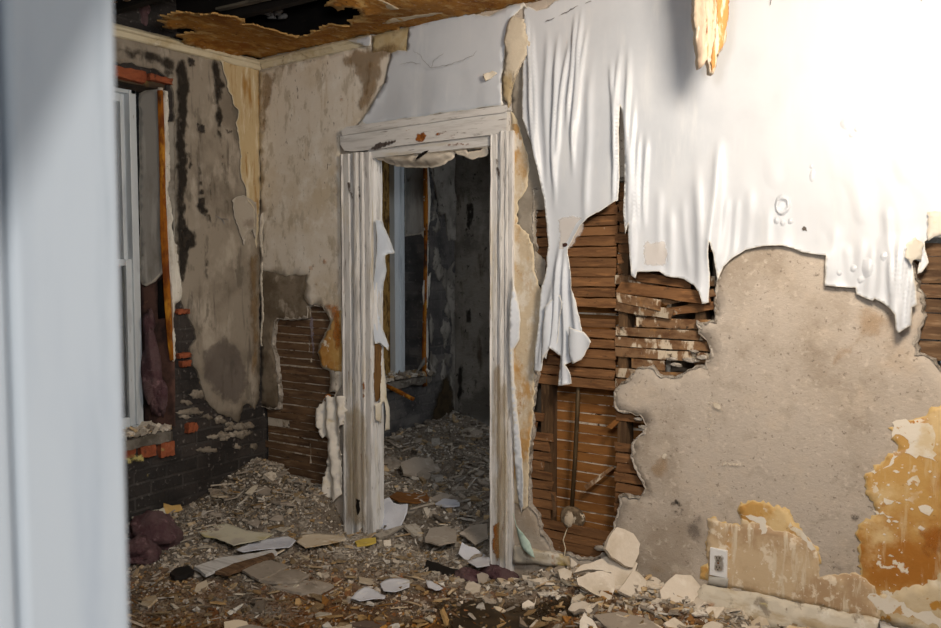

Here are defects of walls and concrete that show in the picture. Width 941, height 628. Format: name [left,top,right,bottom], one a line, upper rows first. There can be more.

water stain [114,37,314,453]
peeling [220,27,409,487]
flaking render [502,15,721,562]
flaking render [912,211,941,371]
peeling [700,406,941,628]